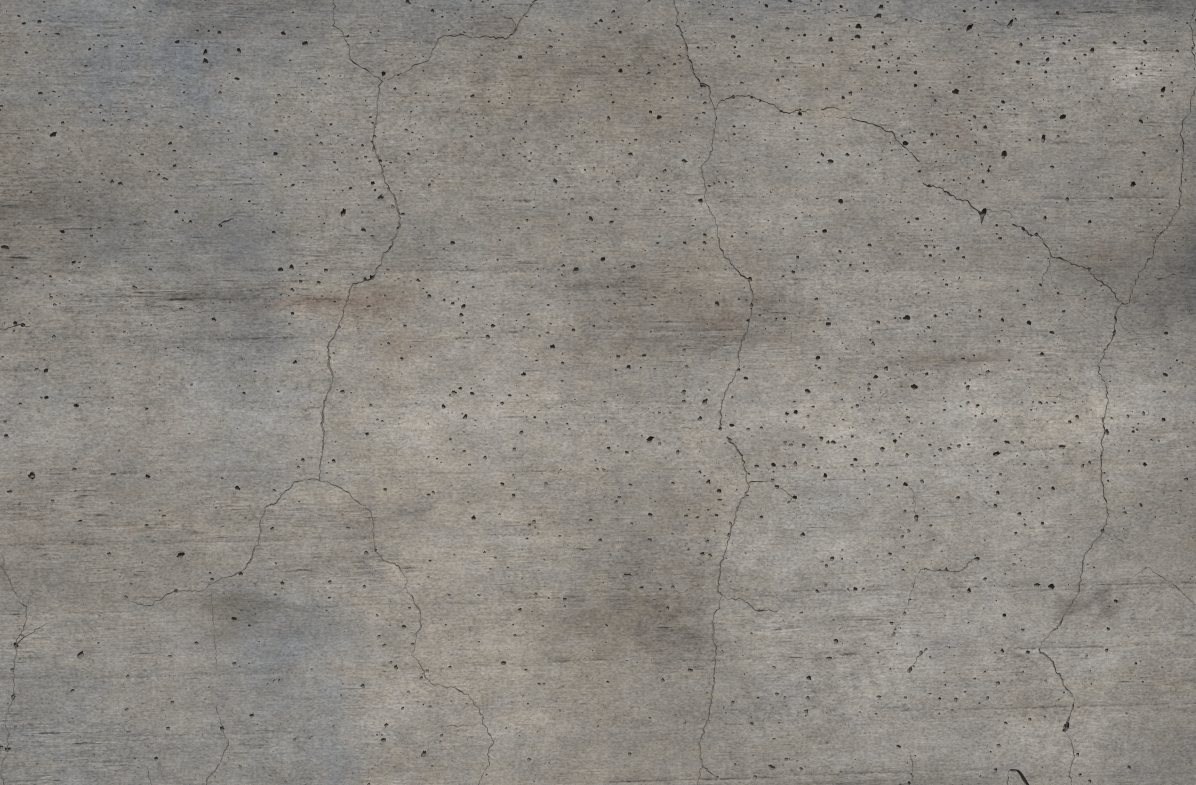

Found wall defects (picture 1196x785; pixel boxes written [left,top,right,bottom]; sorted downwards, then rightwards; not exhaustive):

crack [0,553,48,785]
crack [128,0,538,785]
crack [673,0,1196,785]